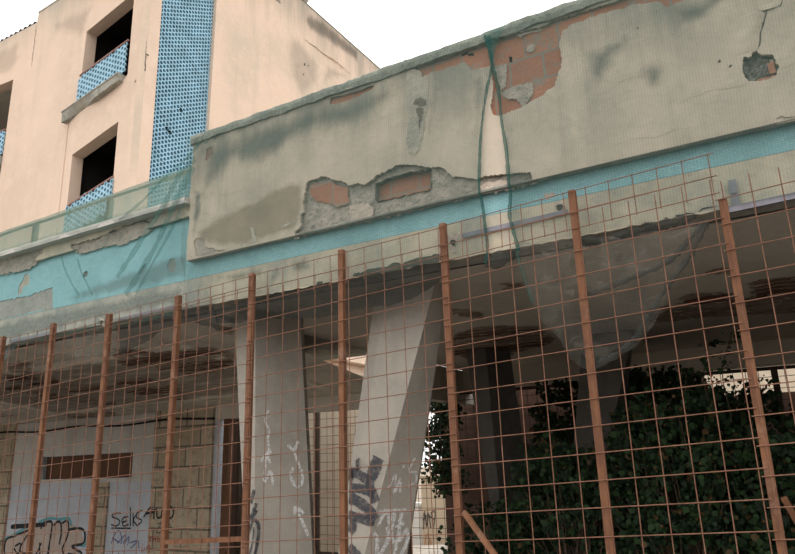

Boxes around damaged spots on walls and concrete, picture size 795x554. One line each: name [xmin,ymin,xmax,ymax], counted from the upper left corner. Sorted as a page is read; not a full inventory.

crack [757,2,782,49]
spalling [406,0,683,155]
spalling [743,53,779,81]
spalling [72,217,155,255]
spalling [294,165,538,239]
spalling [0,249,53,321]